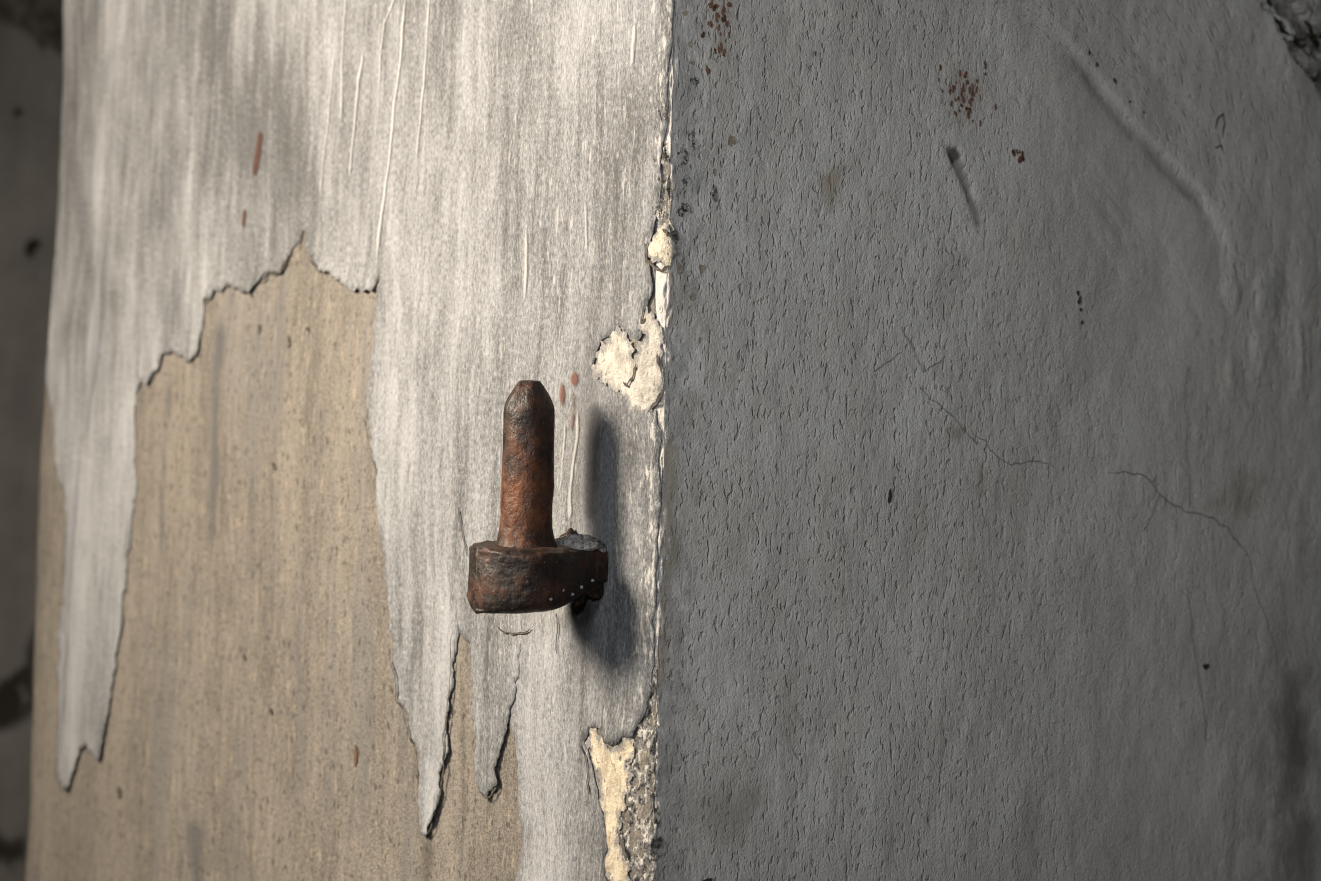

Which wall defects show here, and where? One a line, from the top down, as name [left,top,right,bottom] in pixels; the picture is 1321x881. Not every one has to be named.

rust [701,0,732,76]
rust [938,61,987,127]
spalling [1257,0,1321,98]
spalling [642,103,696,275]
rust [559,373,578,428]
peeling [591,306,665,413]
crack [874,328,1053,467]
peeling [25,231,548,881]
crack [1107,369,1277,665]
spalling [579,661,663,881]